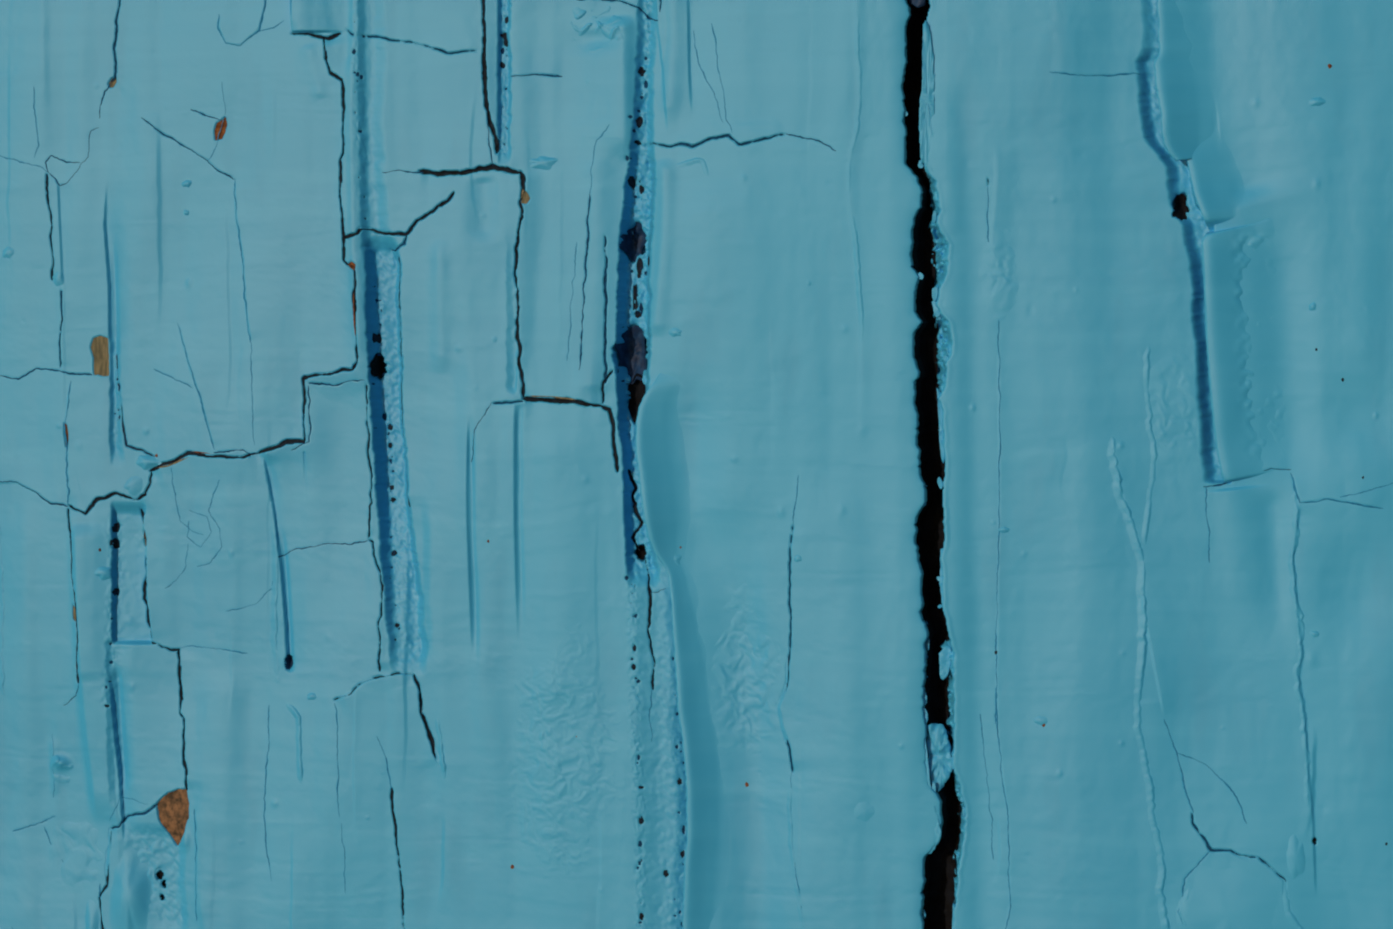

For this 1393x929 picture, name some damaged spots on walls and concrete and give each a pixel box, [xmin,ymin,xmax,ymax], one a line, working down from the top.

hole [626,56,648,198]
spalling [372,286,382,356]
hole [629,249,649,318]
crack [0,0,666,929]
spalling [376,413,396,503]
crack [1203,483,1227,563]
crack [1264,468,1393,509]
crack [1164,719,1286,924]